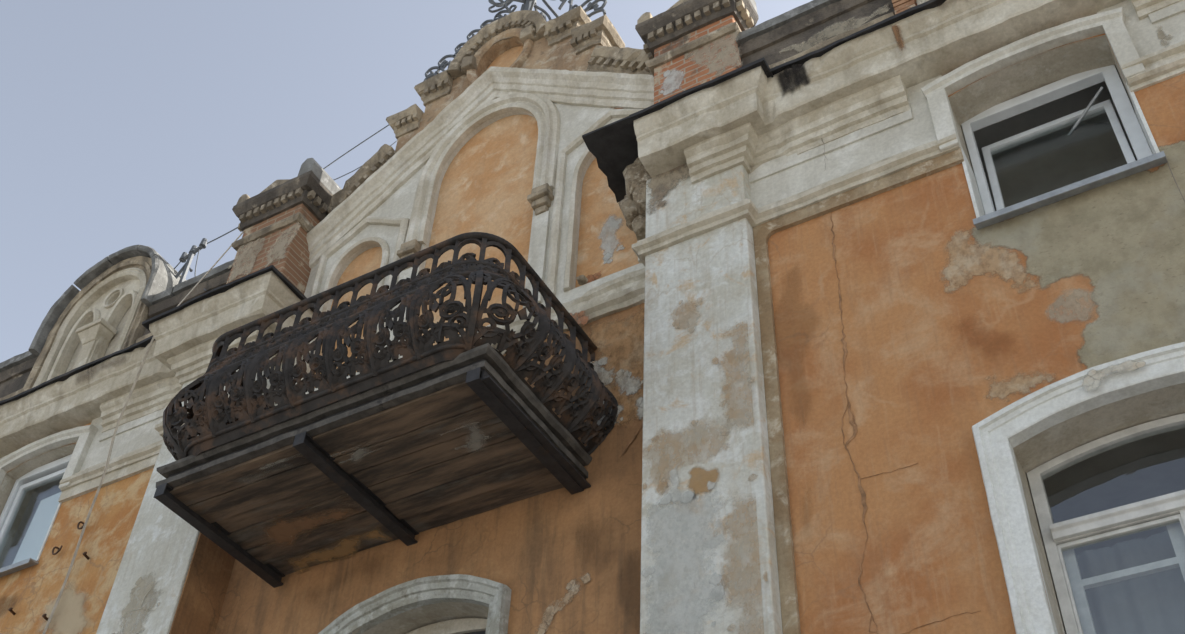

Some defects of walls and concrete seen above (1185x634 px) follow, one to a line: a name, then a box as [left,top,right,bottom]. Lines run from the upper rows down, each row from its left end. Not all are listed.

peeling [660,29,741,95]
spalling [586,157,690,284]
spalling [942,141,1185,391]
peeling [570,308,644,426]
peeling [643,322,754,492]
crack [830,212,979,634]
spalling [987,372,1054,399]
peeling [537,573,590,634]